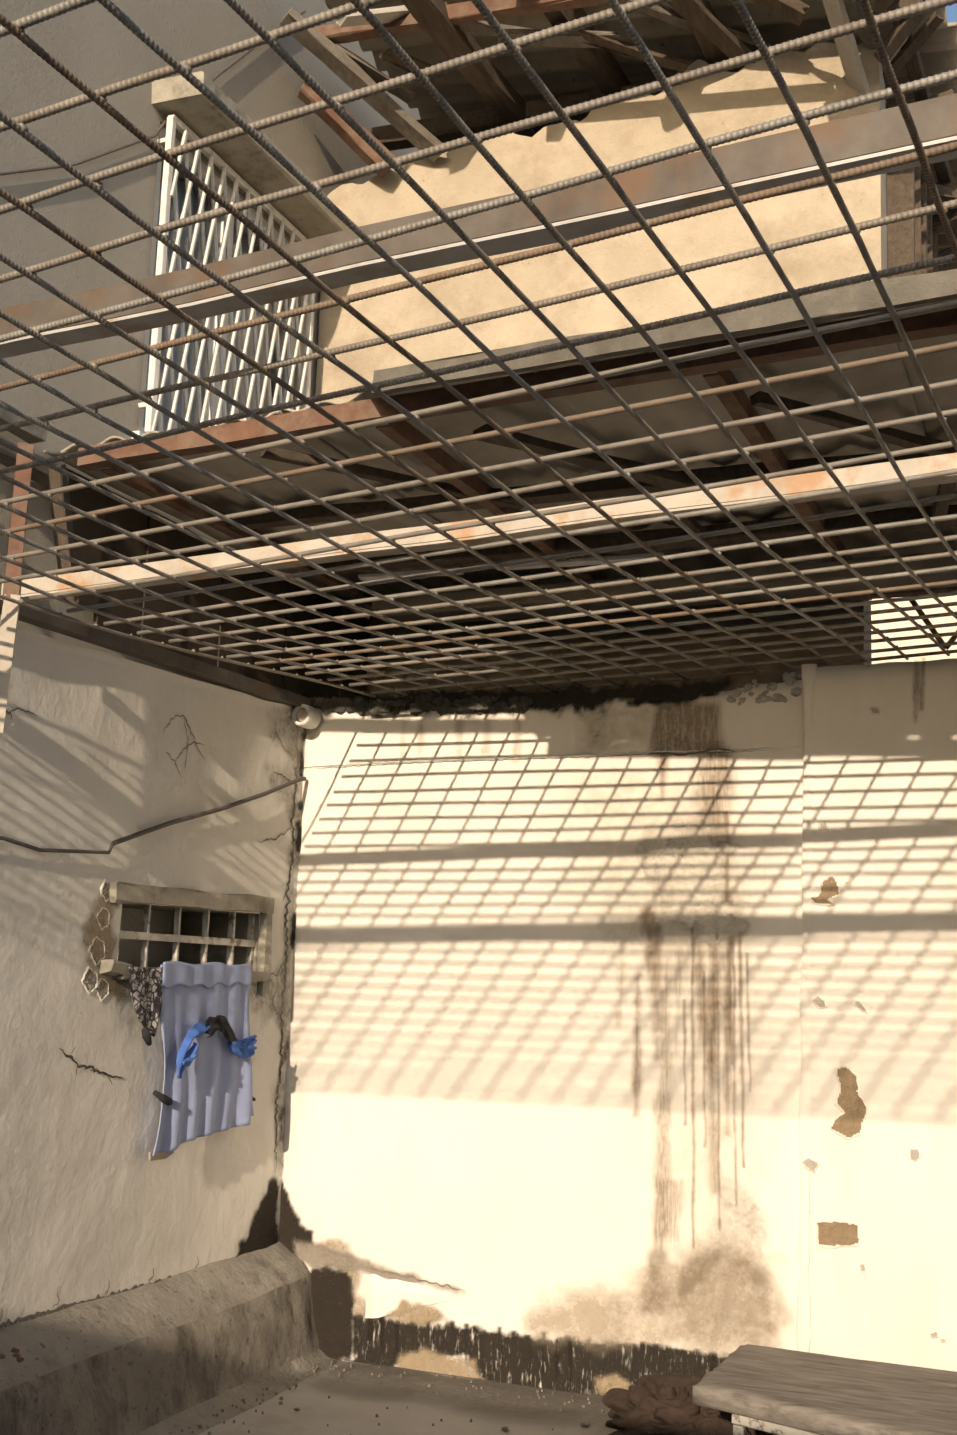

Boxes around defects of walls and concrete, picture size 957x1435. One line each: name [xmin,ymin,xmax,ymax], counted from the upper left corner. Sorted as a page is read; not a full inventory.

crack [164,715,205,775]
spalling [805,874,848,916]
leakage [644,909,659,989]
spalling [823,1051,882,1149]
leakage [237,1178,312,1257]
spalling [804,1208,861,1260]
leakage [531,1256,770,1350]